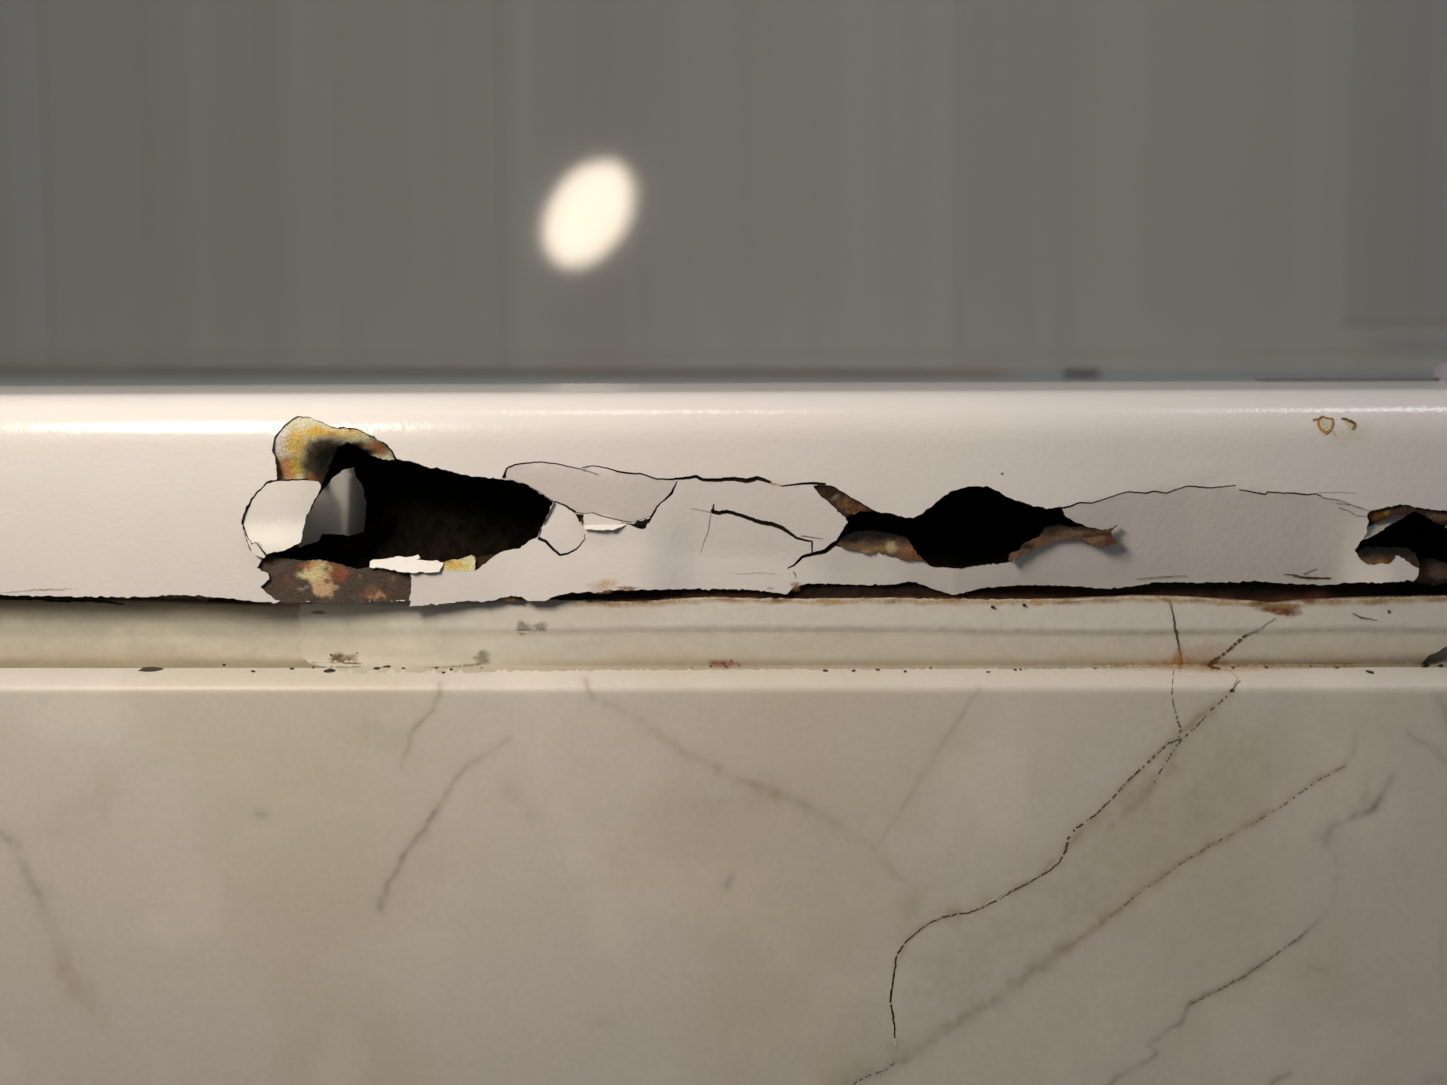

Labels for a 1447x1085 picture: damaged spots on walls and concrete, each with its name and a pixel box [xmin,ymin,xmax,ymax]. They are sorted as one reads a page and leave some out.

peeling [1313,415,1356,437]
rust [273,417,395,485]
rust [158,555,412,604]
peeling [243,467,367,558]
peeling [370,554,444,573]
rust [813,483,927,563]
rust [550,546,1447,615]
rust [1008,524,1118,563]
crack [1284,568,1331,579]
peeling [1364,514,1407,539]
rust [1367,504,1447,526]
crack [853,575,1275,1084]